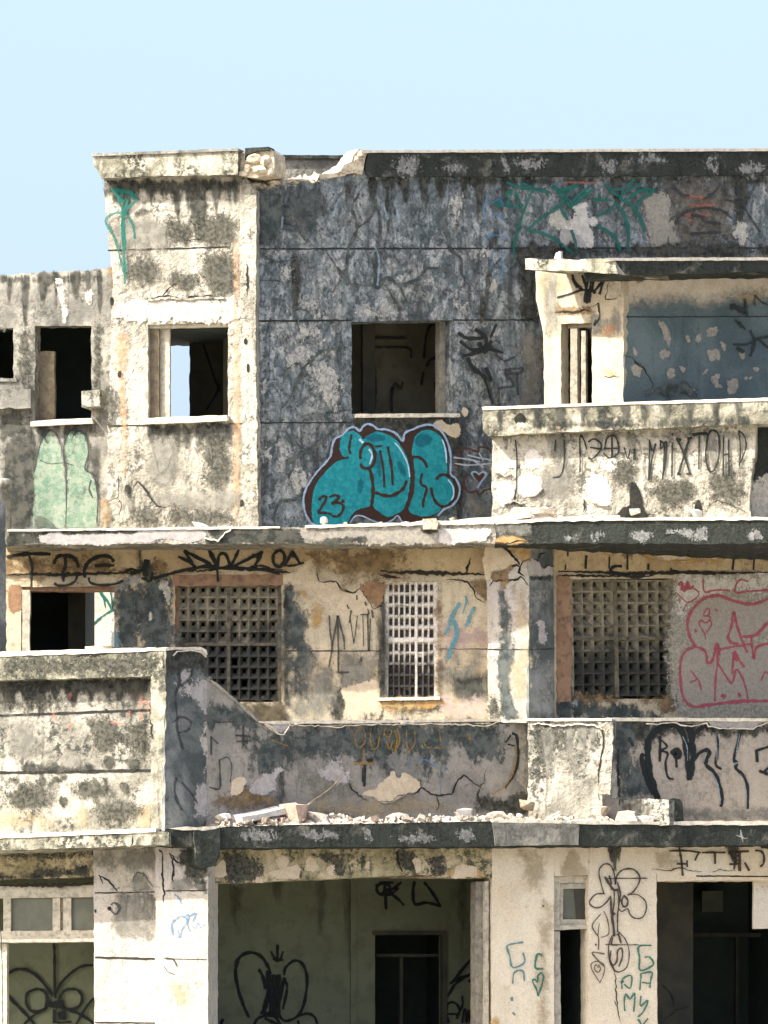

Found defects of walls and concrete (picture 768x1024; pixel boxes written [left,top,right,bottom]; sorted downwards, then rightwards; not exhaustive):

water stain [104,178,243,301]
spalling [239,151,282,186]
water stain [255,177,329,257]
water stain [368,154,554,231]
peeling [548,202,600,249]
water stain [516,152,768,511]
peeling [686,326,759,394]
water stain [0,269,410,942]
crack [317,540,768,609]
peeling [263,679,618,799]
peeling [362,771,420,804]
crack [349,771,486,811]